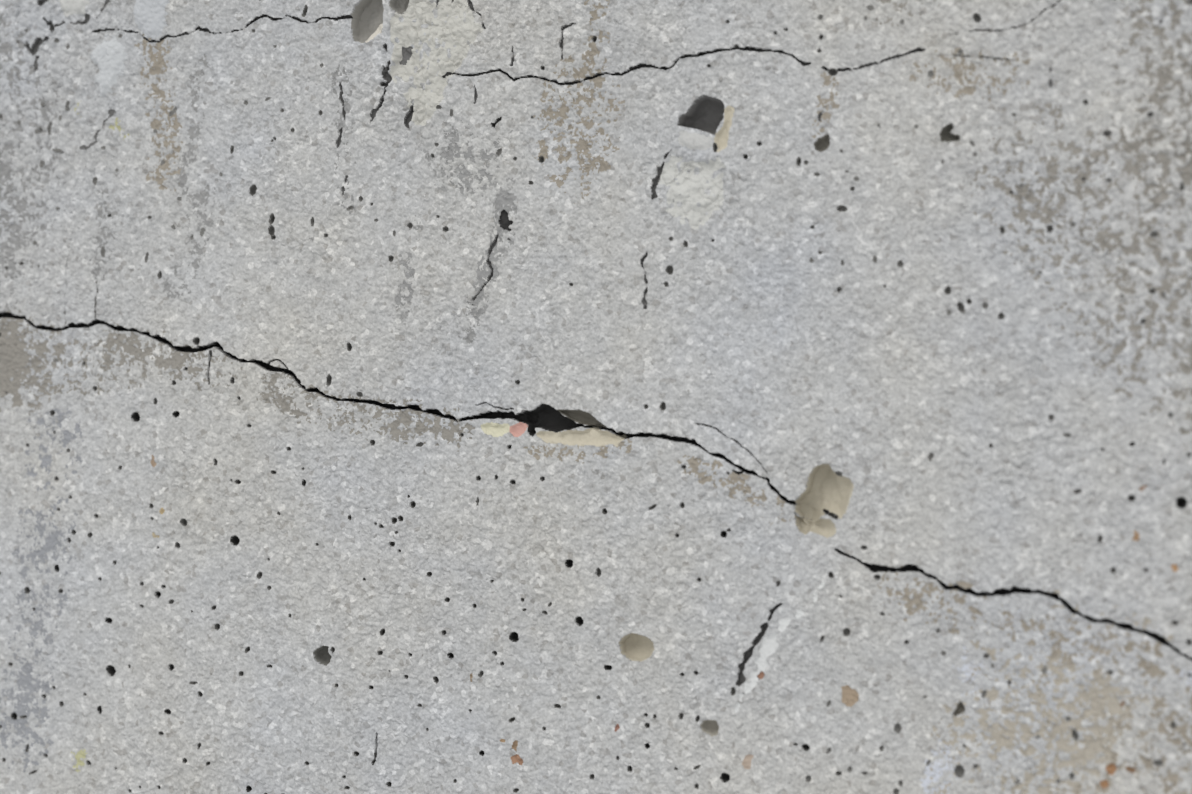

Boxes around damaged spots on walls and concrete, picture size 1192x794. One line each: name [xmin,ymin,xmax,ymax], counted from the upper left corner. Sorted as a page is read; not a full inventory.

crack [24,0,353,71]
spalling [351,0,484,126]
crack [442,23,925,104]
spalling [658,95,734,230]
crack [0,281,796,504]
spalling [481,422,510,437]
spalling [536,409,627,447]
hole [795,464,854,538]
crack [823,509,838,519]
hole [619,633,654,662]
crack [736,603,782,687]
crack [835,549,1192,661]